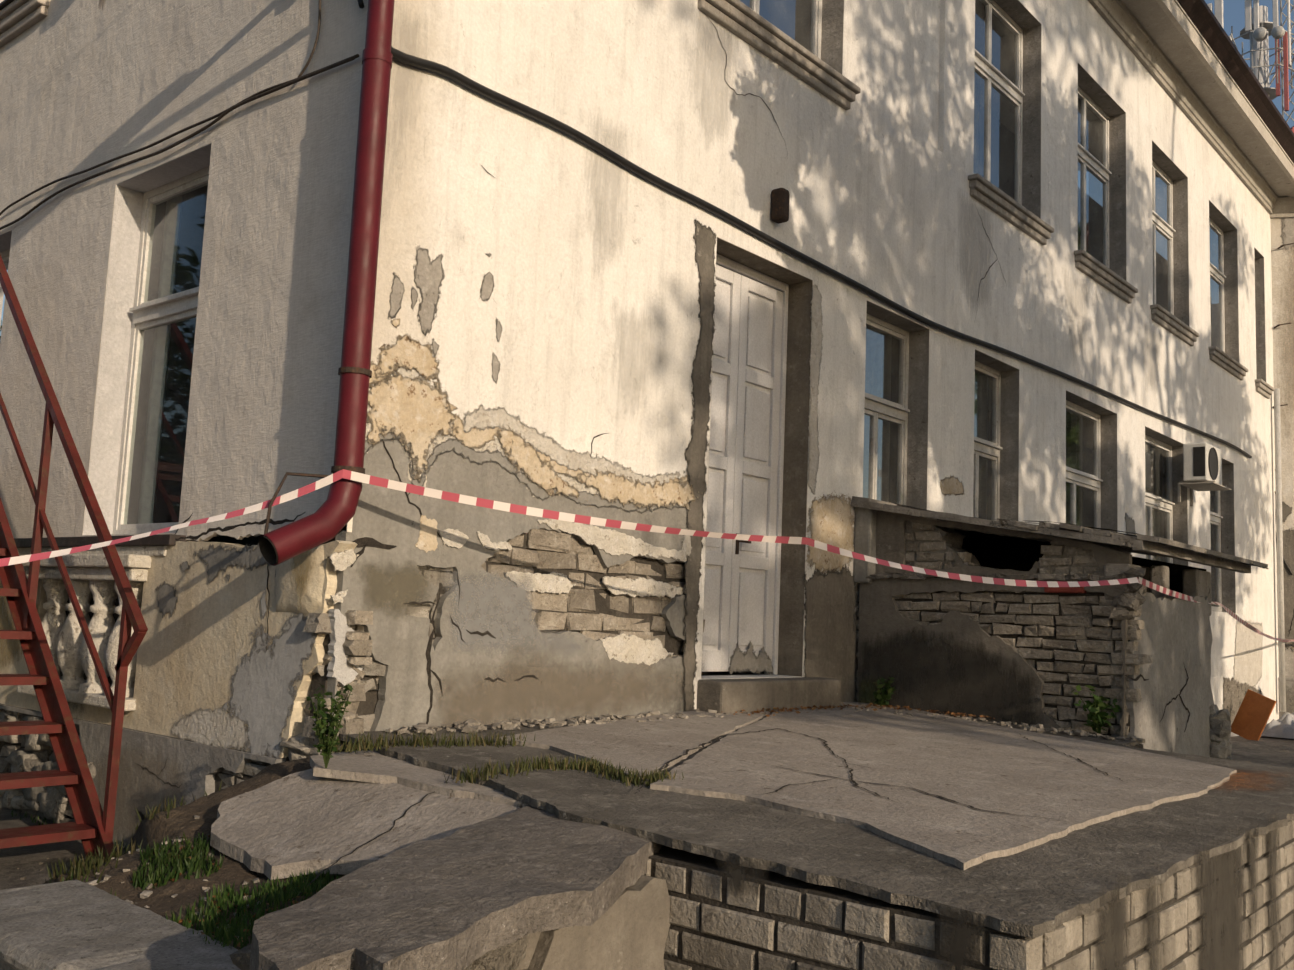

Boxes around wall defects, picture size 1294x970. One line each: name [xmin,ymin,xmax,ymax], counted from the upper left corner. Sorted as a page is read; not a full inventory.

crack [704,13,788,156]
flaking render [171,219,717,792]
peeling [155,581,178,618]
peeling [728,641,773,675]
leakage [861,630,1034,727]
crack [1124,665,1190,732]
crack [634,728,1056,820]
crack [1020,734,1128,783]
crack [292,775,450,901]